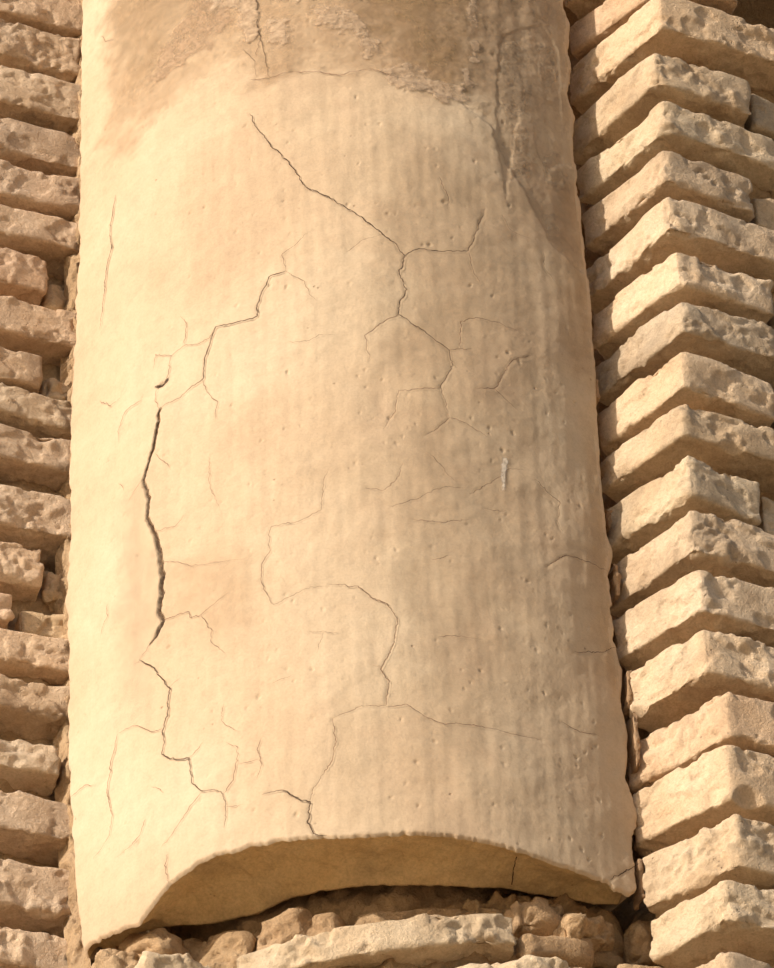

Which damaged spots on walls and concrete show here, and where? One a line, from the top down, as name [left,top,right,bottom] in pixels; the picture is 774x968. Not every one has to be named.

crack [247,0,415,83]
crack [251,115,500,434]
crack [73,233,539,875]